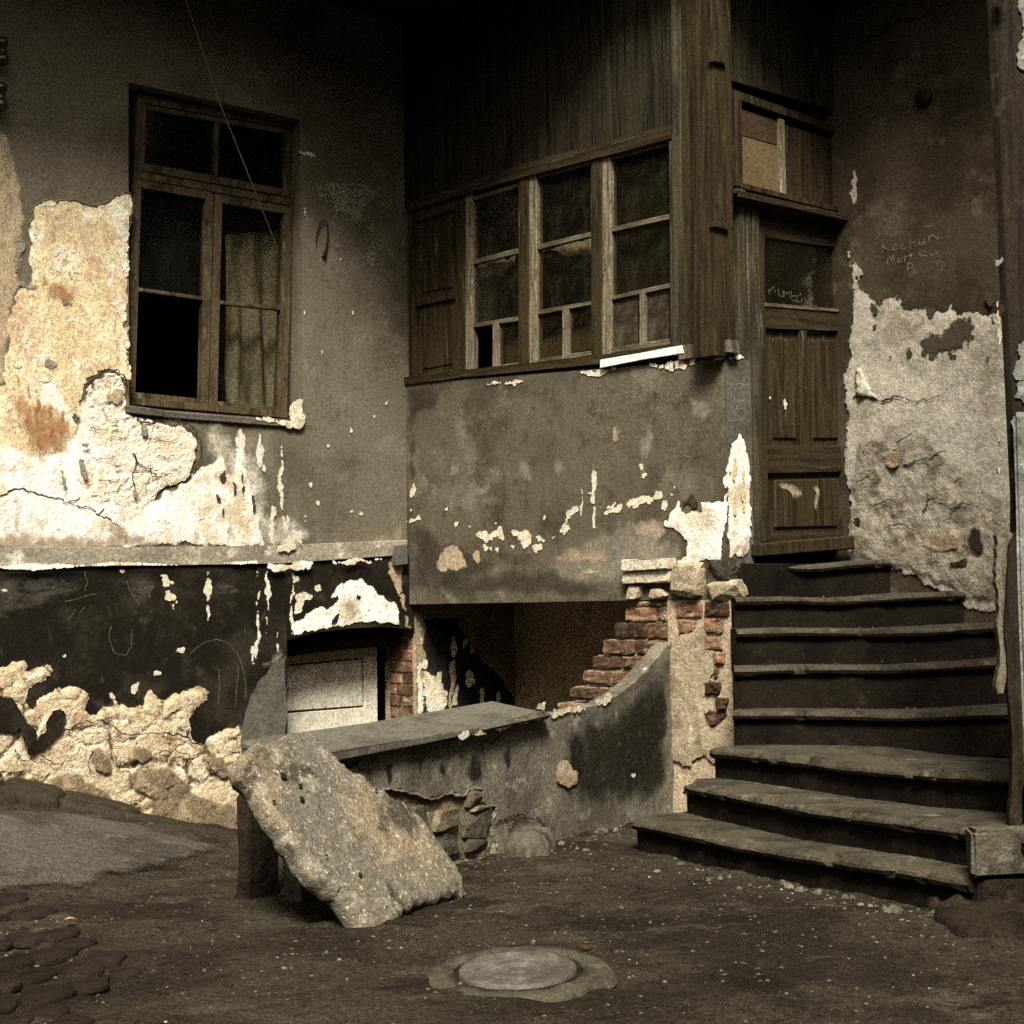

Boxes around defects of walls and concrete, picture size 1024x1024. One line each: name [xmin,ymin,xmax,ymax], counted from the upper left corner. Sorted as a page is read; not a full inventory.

corrosion [17,377,68,457]
crack [0,488,120,526]
crack [85,369,129,389]
flaking render [0,191,269,547]
crack [90,419,202,500]
flaking render [256,399,306,429]
peeling [267,524,399,635]
peeling [454,506,579,553]
flaking render [604,434,752,599]
peeling [843,251,1024,612]
flaking render [0,659,242,829]
damp [569,681,666,797]